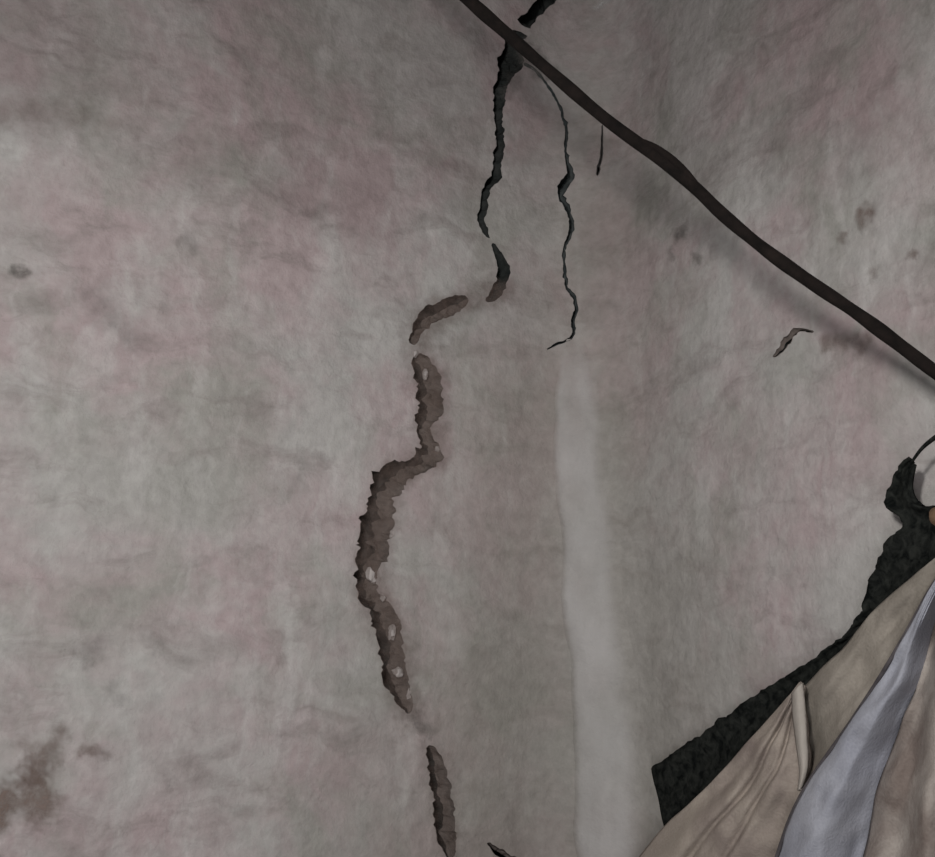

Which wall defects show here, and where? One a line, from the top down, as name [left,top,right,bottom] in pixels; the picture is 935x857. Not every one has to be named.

crack [353,0,603,714]
crack [426,745,457,857]
crack [487,842,516,857]